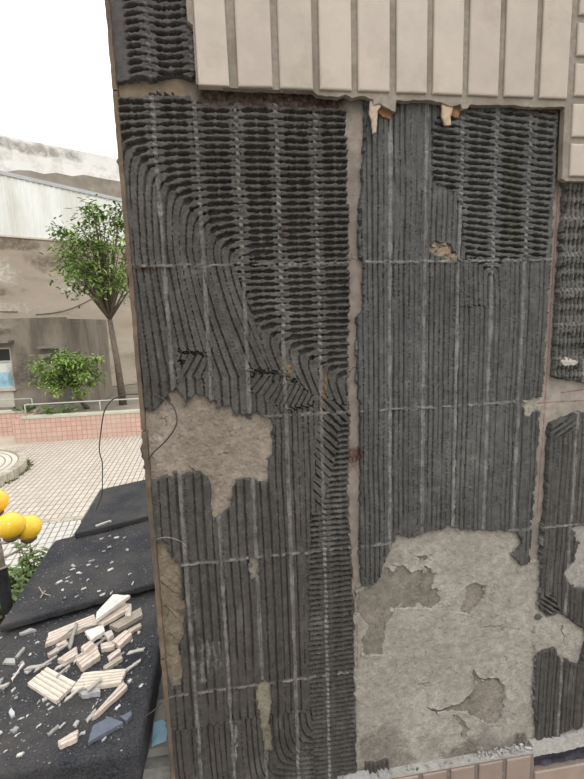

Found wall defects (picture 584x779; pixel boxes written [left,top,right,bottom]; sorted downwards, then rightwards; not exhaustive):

peeling [368,100,392,134]
peeling [441,104,460,126]
spalling [429,241,458,262]
spalling [521,395,544,417]
spalling [143,388,275,522]
peeling [56,559,113,599]
spalling [248,557,259,580]
spalling [157,540,186,686]
spalling [352,525,584,771]
spalling [255,680,274,752]